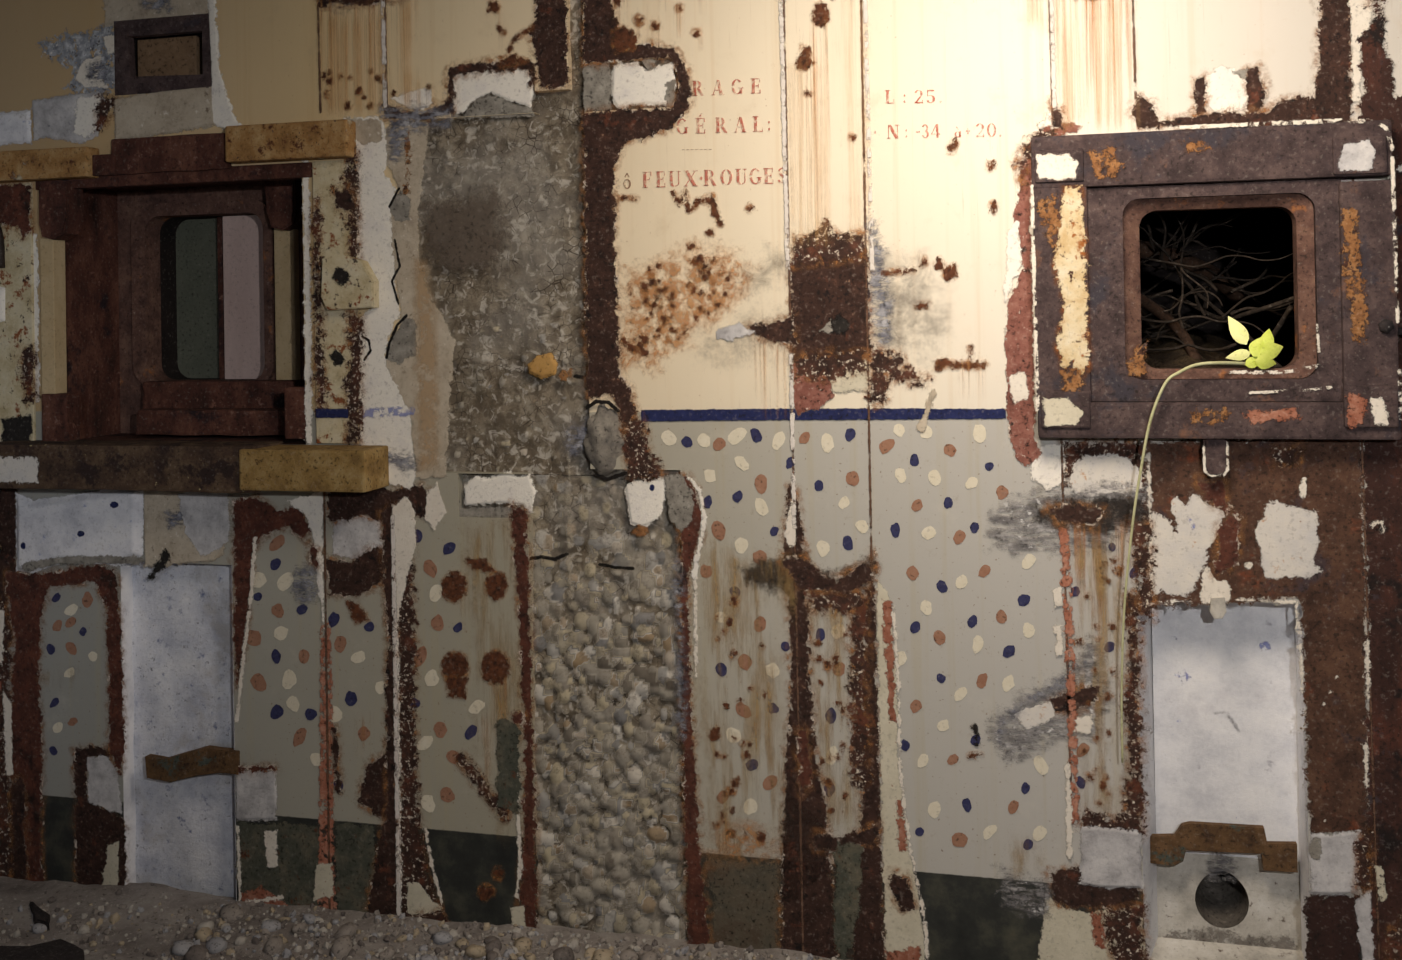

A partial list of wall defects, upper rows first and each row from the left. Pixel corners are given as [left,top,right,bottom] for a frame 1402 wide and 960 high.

rust [0,488,126,881]
spalling [343,0,688,939]
rust [316,0,987,960]
rust [986,121,1083,467]
peeling [1038,527,1151,960]
rust [1044,0,1402,960]